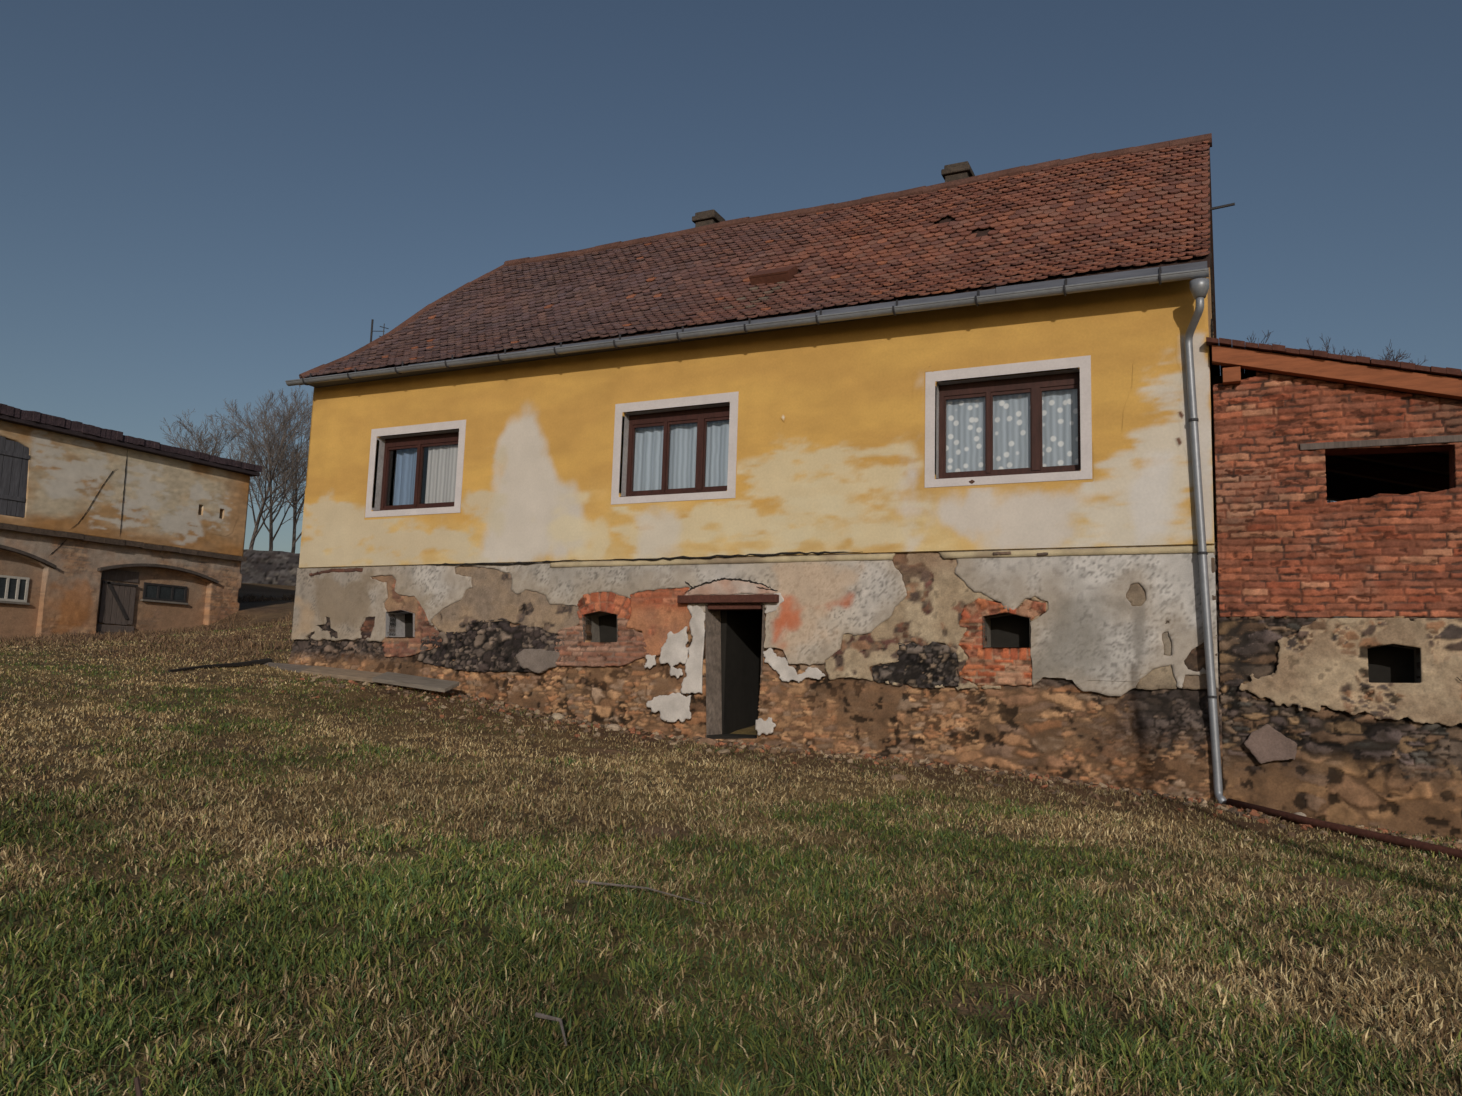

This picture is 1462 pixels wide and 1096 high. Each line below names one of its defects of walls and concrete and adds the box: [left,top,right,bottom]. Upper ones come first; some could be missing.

peeling [27,428,239,547]
peeling [299,326,1214,722]
peeling [755,717,776,736]
peeling [1239,618,1462,726]